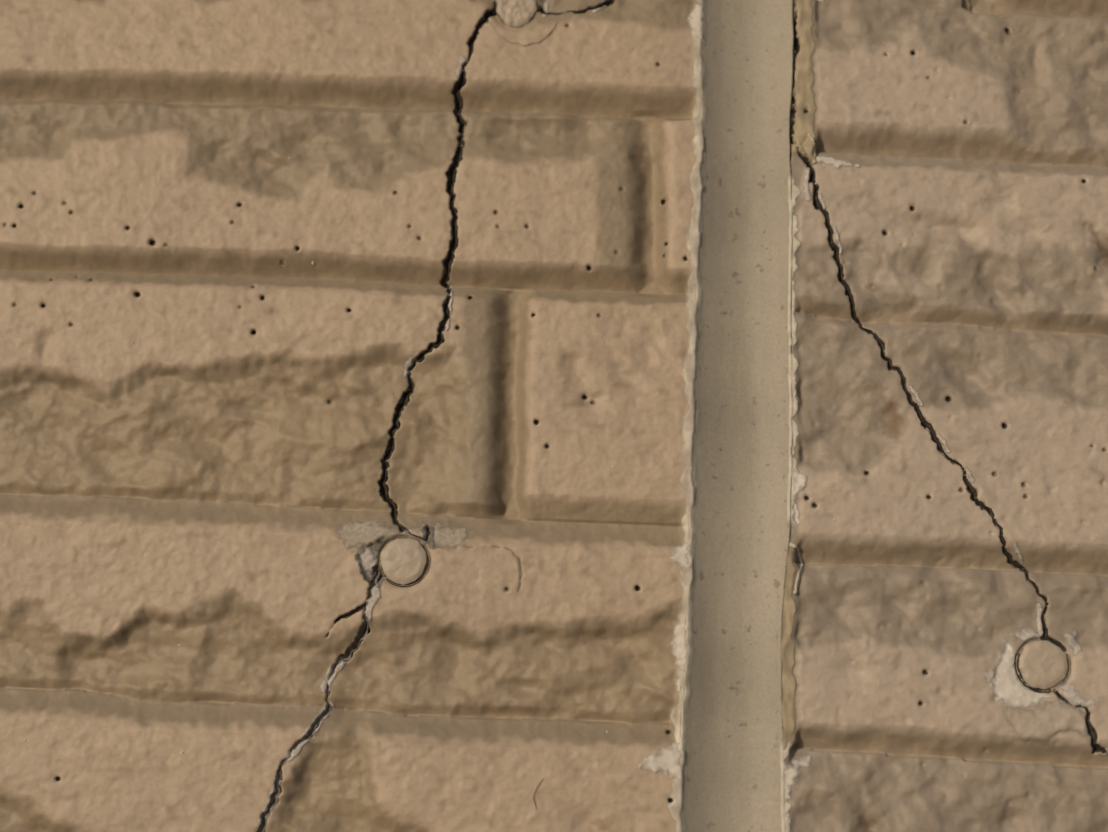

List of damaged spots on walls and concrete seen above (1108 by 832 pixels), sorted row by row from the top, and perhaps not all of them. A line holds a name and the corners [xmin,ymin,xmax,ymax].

crack [379,0,614,592]
crack [790,5,1065,648]
crack [257,568,381,832]
crack [1055,690,1108,756]